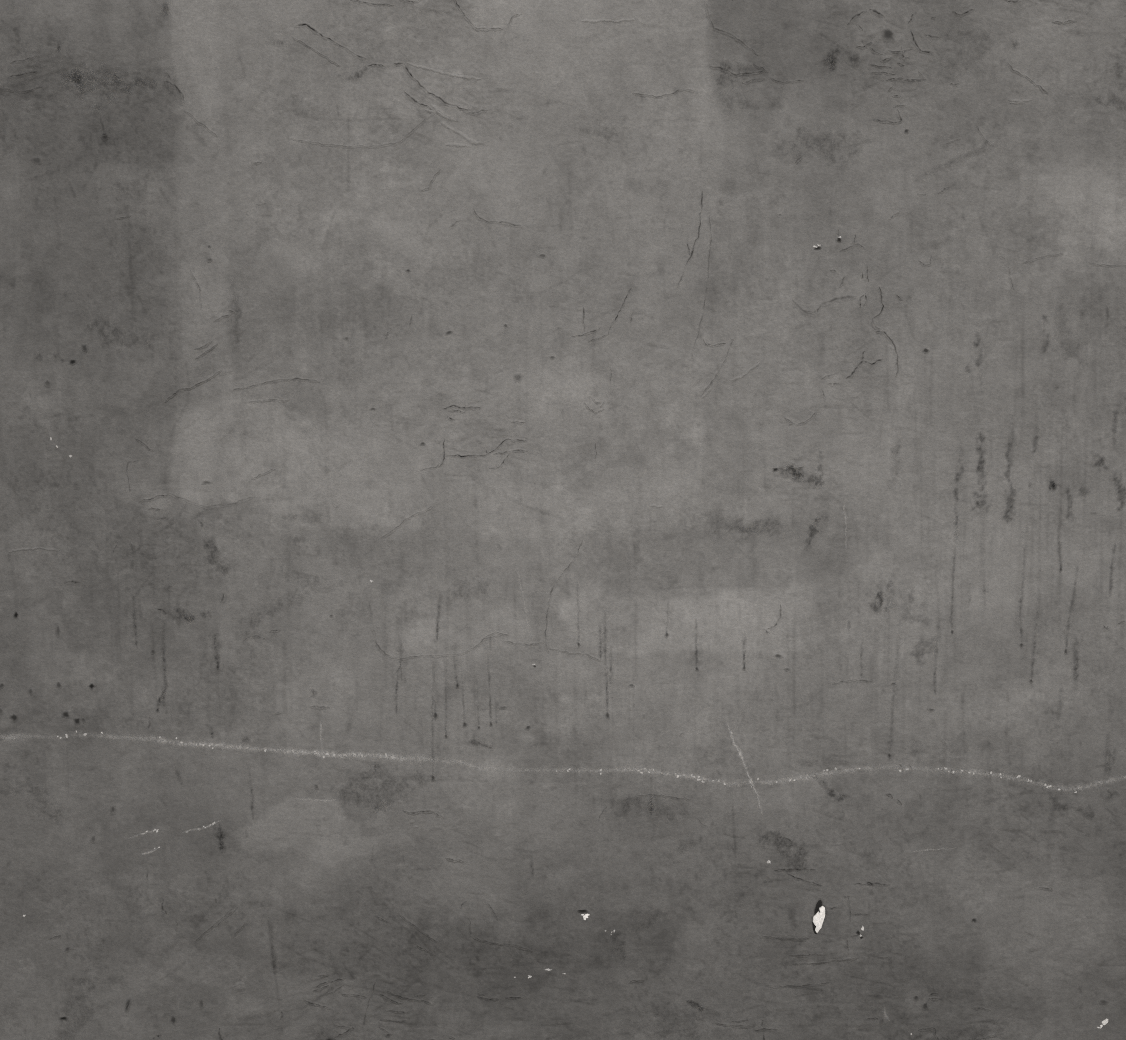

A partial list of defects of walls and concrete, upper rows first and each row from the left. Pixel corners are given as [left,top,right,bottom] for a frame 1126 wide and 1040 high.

spalling [812,900,825,934]